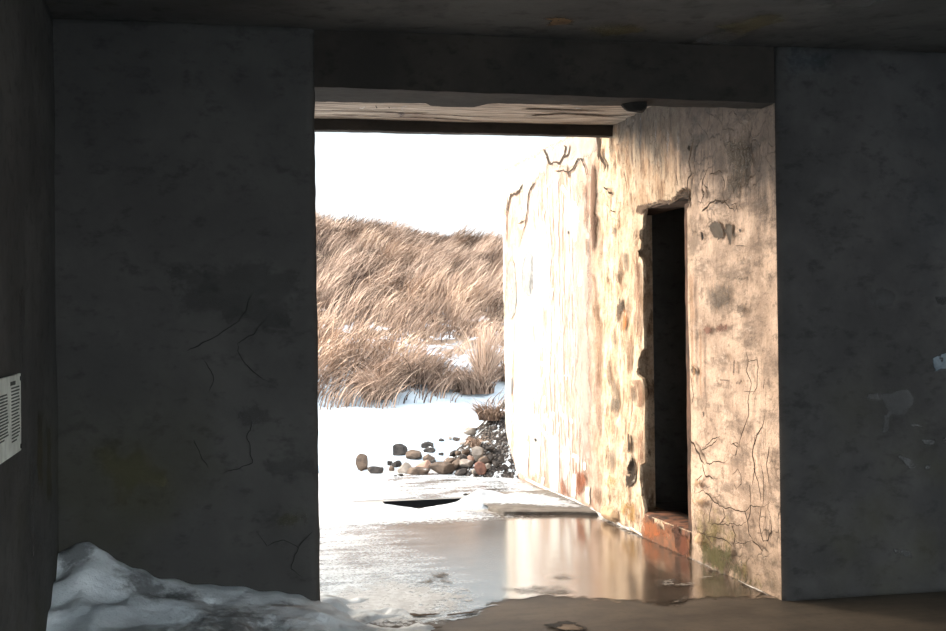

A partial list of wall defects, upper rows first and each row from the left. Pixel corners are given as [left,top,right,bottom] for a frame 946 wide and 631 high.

crack [334,110,486,122]
crack [526,109,628,212]
crack [676,138,751,212]
crack [506,183,535,242]
spalling [701,221,744,246]
peeling [933,353,946,371]
spalling [626,431,643,487]
crack [689,353,772,551]
corrosion [641,517,690,557]